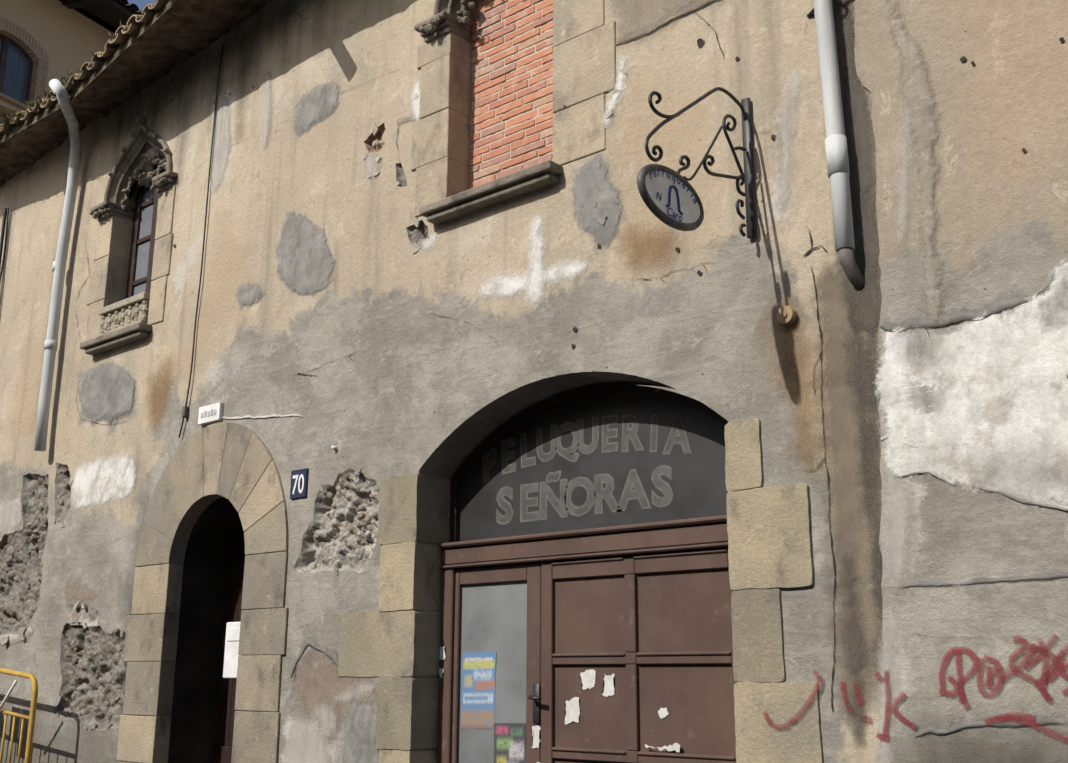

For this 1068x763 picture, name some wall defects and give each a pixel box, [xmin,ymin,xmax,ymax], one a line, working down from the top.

spalling [363,123,386,178]
spalling [0,462,73,646]
spalling [294,468,380,576]
crack [803,231,836,712]
water stain [818,0,909,763]
peeling [877,263,1068,505]
spalling [54,599,127,731]